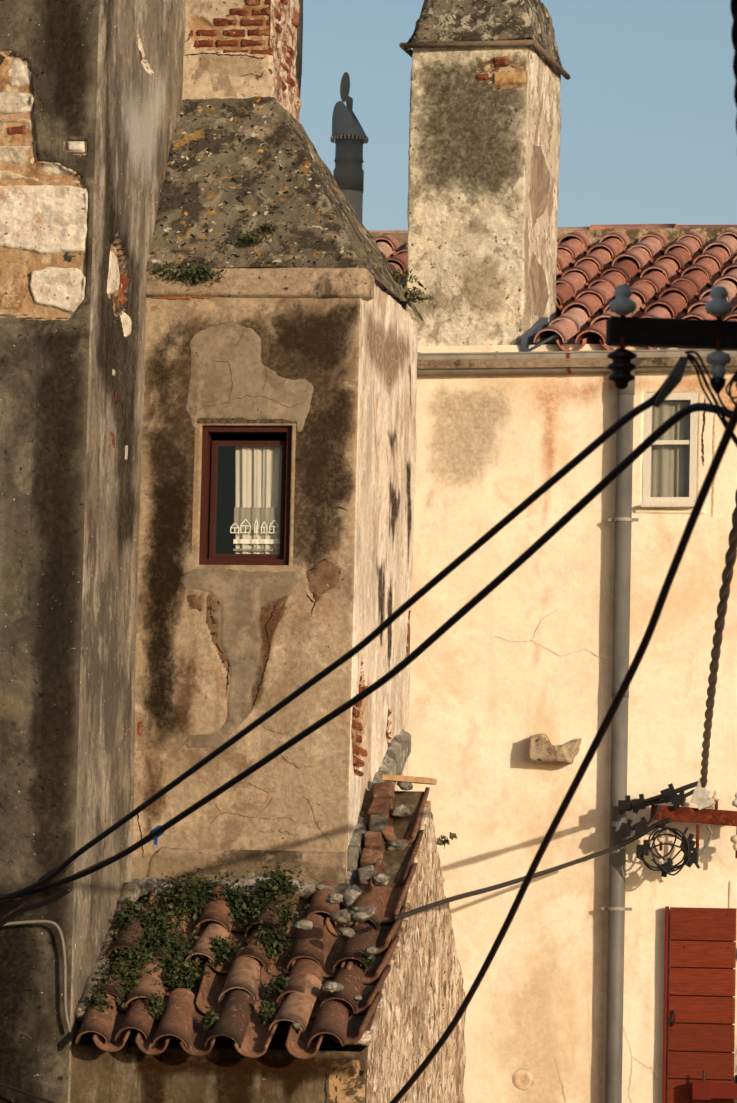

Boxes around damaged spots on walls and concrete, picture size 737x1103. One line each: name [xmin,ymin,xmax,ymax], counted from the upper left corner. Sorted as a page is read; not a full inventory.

flaking render [188,0,299,91]
flaking render [0,51,88,321]
flaking render [476,52,561,229]
water stain [98,103,193,742]
flaking render [306,559,341,603]
flaking render [187,594,230,683]
crack [498,608,605,660]
water stain [0,334,79,1103]
flaking render [351,658,368,777]
crack [210,797,332,844]
flaking render [329,1059,366,1103]